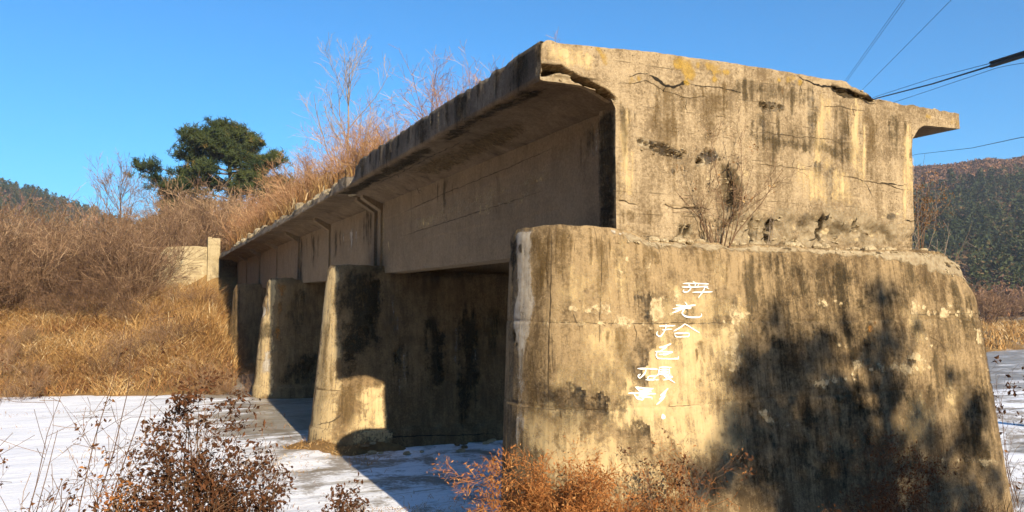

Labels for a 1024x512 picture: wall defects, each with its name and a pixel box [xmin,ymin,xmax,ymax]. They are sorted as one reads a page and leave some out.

crack [618,73,744,113]
leakage [694,79,809,114]
spalling [618,138,967,282]
leakage [751,95,875,203]
crack [797,75,882,116]
leakage [889,118,913,219]
leakage [252,267,408,444]
leakage [425,304,500,424]
leakage [811,263,992,472]